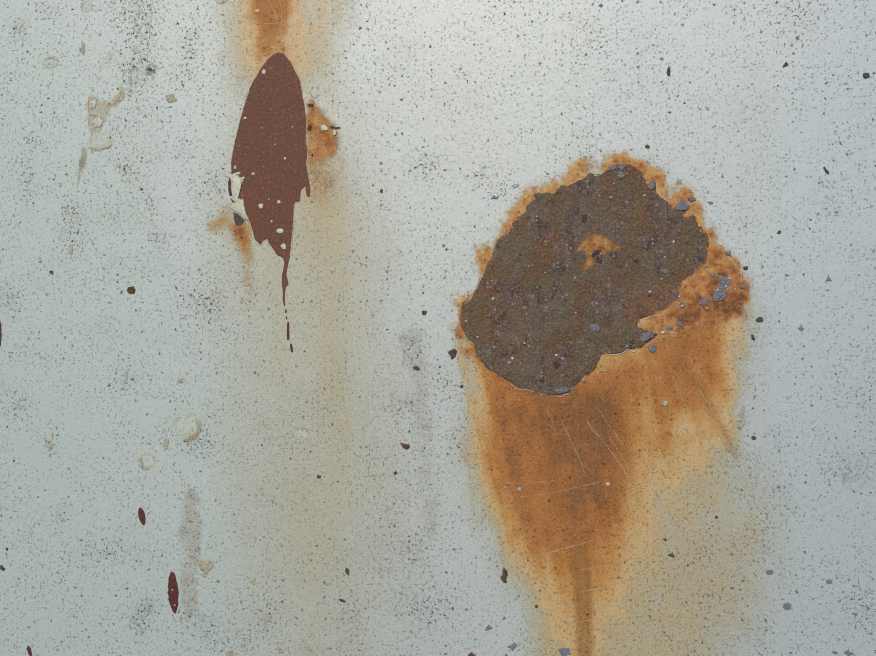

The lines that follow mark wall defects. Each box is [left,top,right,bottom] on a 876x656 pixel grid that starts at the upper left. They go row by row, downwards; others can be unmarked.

rust [226,0,341,86]
rust [209,209,251,257]
rust [455,152,751,656]